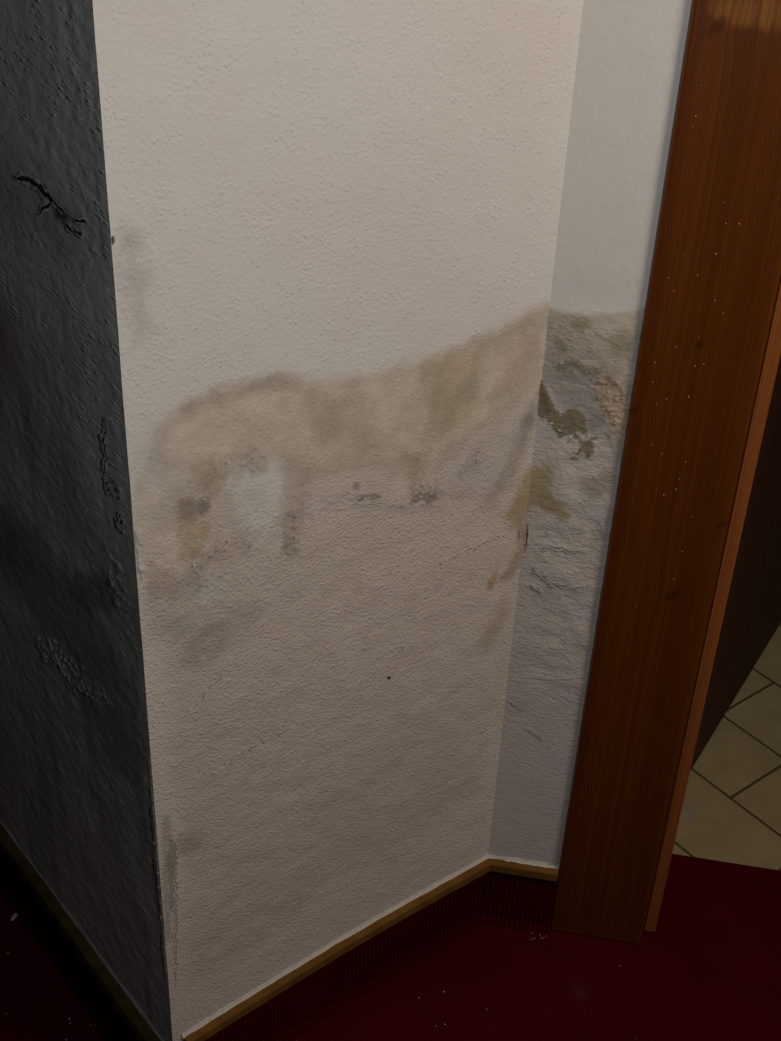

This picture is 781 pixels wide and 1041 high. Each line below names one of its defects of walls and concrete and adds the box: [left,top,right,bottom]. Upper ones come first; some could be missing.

damp [139,306,645,631]
spalling [538,380,597,460]